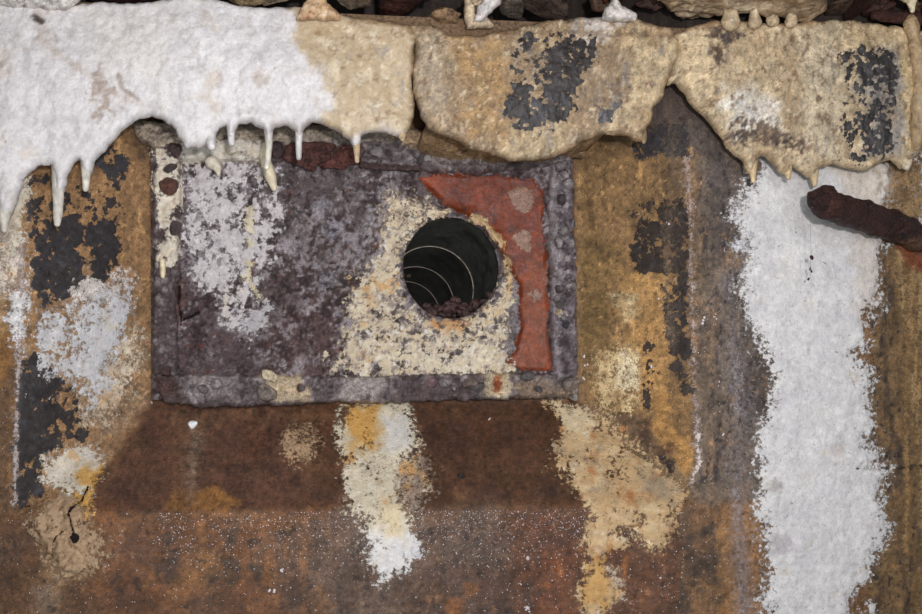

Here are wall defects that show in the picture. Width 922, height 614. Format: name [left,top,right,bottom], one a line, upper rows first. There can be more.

corrosion [281,141,421,172]
corrosion [884,161,922,218]
efflorescence [334,402,437,591]
efflorescence [541,149,703,614]
corrosion [892,243,922,614]